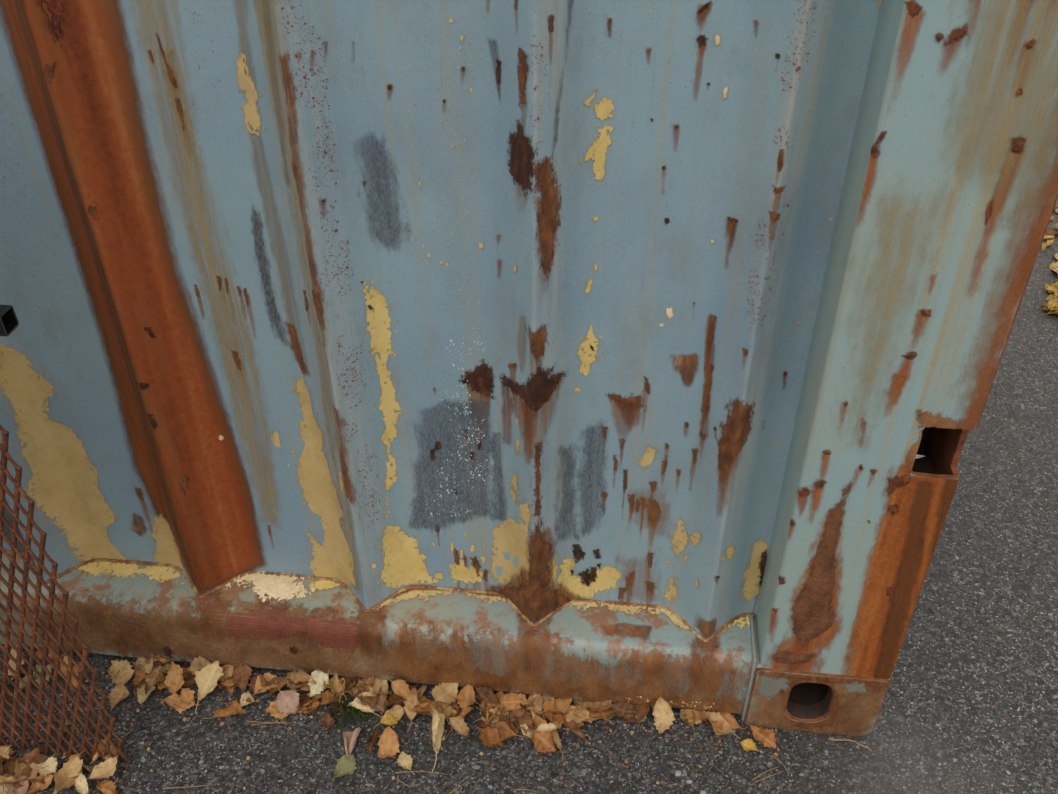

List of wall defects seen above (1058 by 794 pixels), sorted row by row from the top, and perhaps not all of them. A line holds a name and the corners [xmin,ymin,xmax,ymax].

peeling [235,52,265,139]
peeling [579,89,616,184]
corrosion [859,131,887,212]
corrosion [899,0,923,63]
corrosion [936,0,979,60]
corrosion [974,135,1026,277]
corrosion [0,0,755,714]
peeling [0,343,187,584]
peeling [223,370,356,603]
peeling [359,279,534,610]
corrosion [749,163,1058,737]
peeling [548,517,701,634]